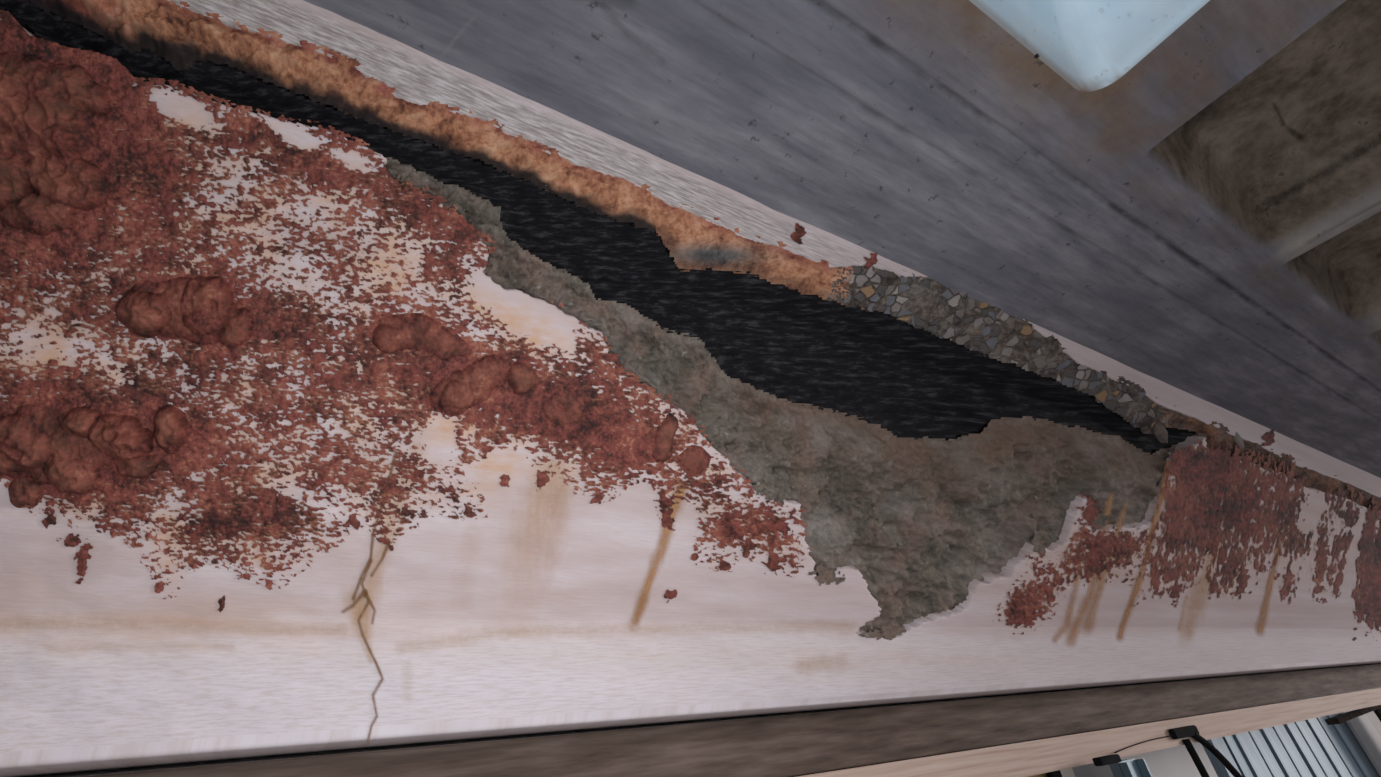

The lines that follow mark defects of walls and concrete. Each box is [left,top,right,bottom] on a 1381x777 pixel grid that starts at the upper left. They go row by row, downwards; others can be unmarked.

peeling [0,0,854,590]
rust [790,223,806,244]
spalling [384,157,1175,640]
peeling [826,265,1381,636]
rust [1262,430,1275,450]
crack [343,452,397,744]
rust [635,484,685,622]
rust [1118,463,1169,639]
rust [1257,538,1282,632]